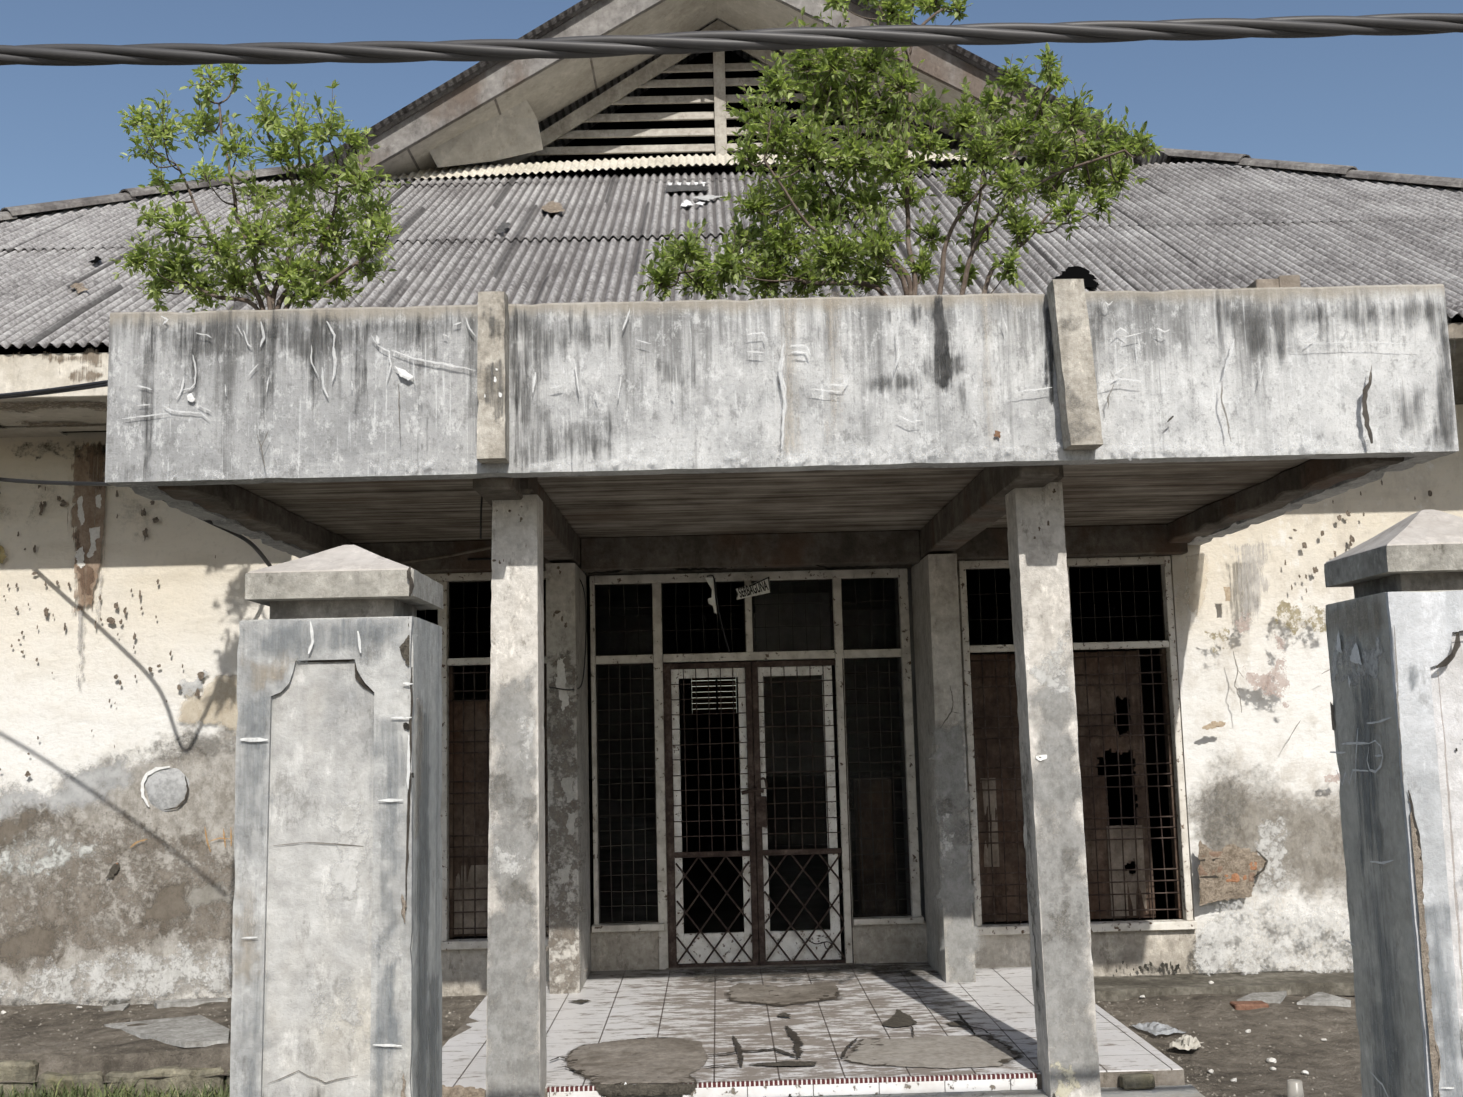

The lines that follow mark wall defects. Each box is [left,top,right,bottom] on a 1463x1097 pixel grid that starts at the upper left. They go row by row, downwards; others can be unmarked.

leakage [237,322,275,411]
leakage [310,322,598,413]
leakage [747,332,811,462]
leakage [875,296,966,399]
leakage [1012,308,1085,407]
crack [1362,366,1373,444]
leakage [1391,302,1454,450]
leakage [1116,542,1386,976]
leakage [0,670,265,1006]
flaking render [1198,840,1268,906]
leakage [377,968,397,1085]
leakage [1426,908,1463,1097]